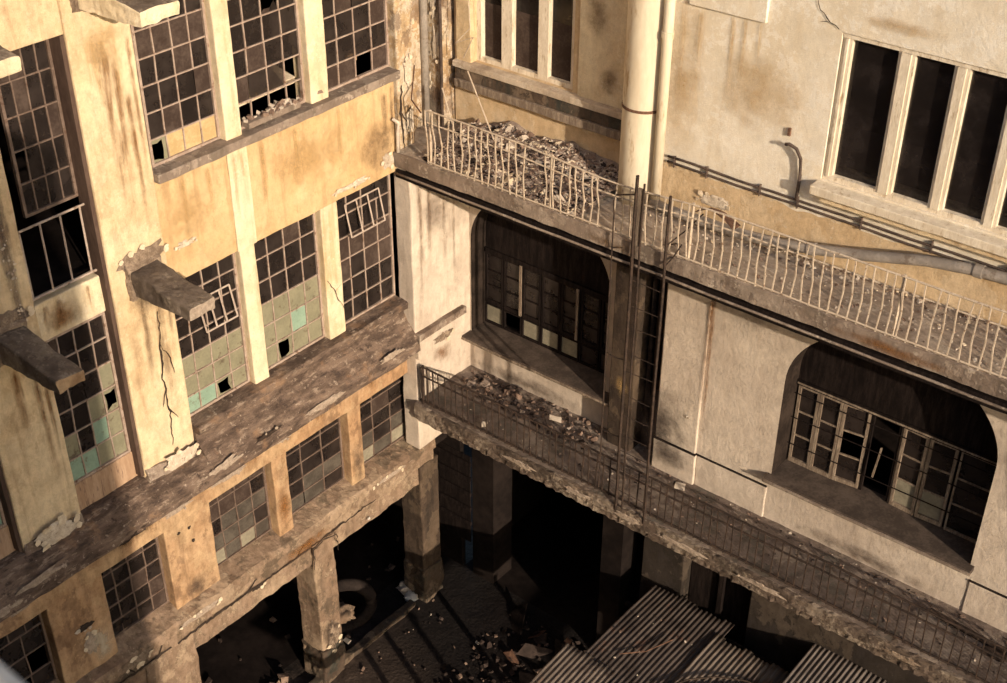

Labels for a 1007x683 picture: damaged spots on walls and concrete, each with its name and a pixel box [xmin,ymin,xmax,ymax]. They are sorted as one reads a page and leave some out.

spalling [116,237,198,272]
spalling [0,304,35,332]
crack [157,311,178,442]
spalling [164,443,201,471]
spalling [34,513,83,552]